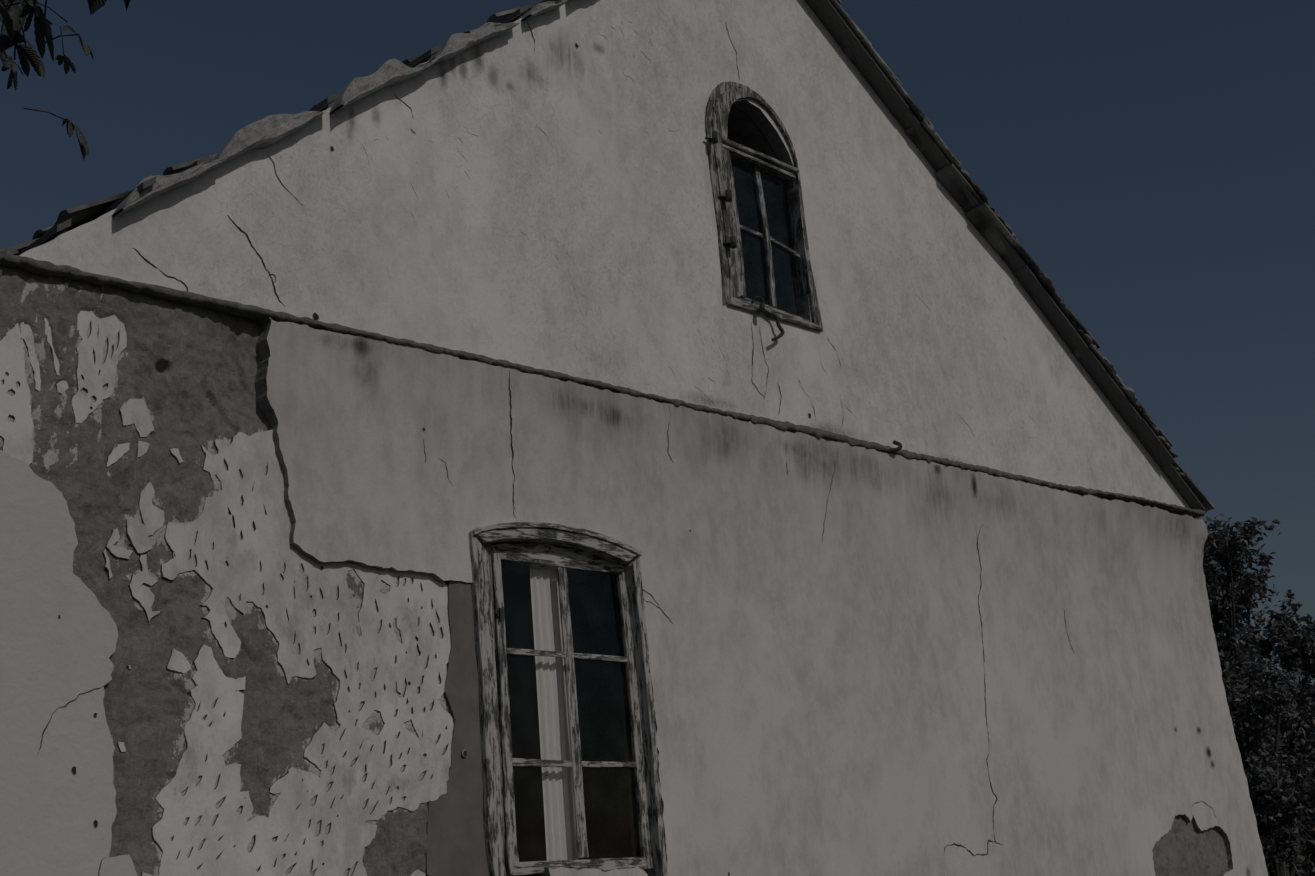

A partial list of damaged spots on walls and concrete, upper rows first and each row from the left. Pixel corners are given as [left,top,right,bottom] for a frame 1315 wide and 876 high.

flaking render [0,266,506,876]
crack [508,371,516,518]
crack [944,525,1002,876]
flaking render [1152,815,1228,876]